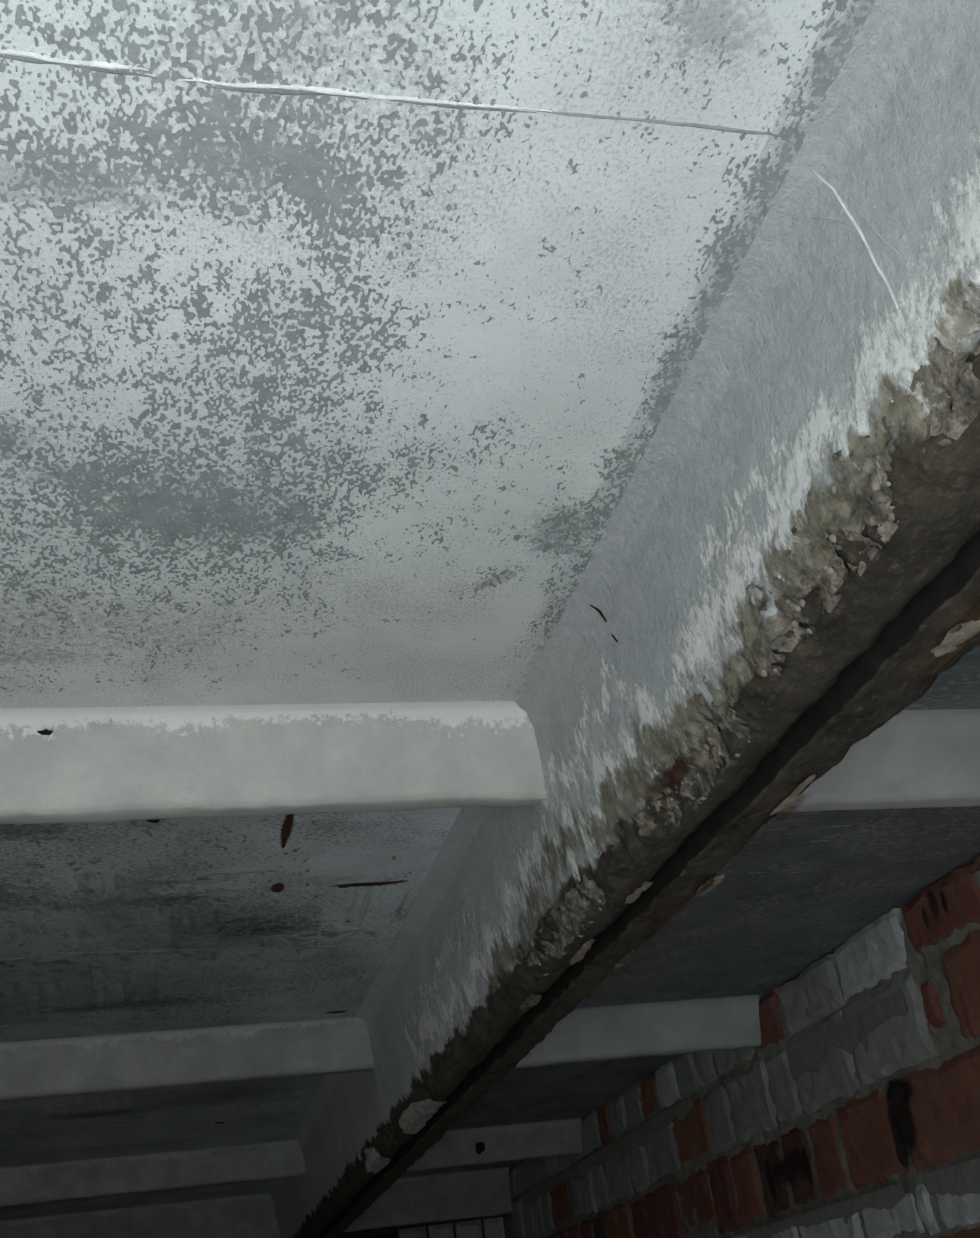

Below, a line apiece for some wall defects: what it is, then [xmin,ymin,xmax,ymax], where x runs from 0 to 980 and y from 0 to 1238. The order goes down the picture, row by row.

crack [0,48,785,138]
crack [812,171,942,329]
spalling [740,337,980,679]
damp [402,137,980,1072]
corrosion [281,814,294,848]
corrosion [648,758,688,794]
spalling [631,677,751,836]
spalling [770,774,816,816]
corrosion [334,880,409,888]
spalling [528,875,607,976]
spalling [364,1147,391,1174]
spalling [399,1099,447,1134]